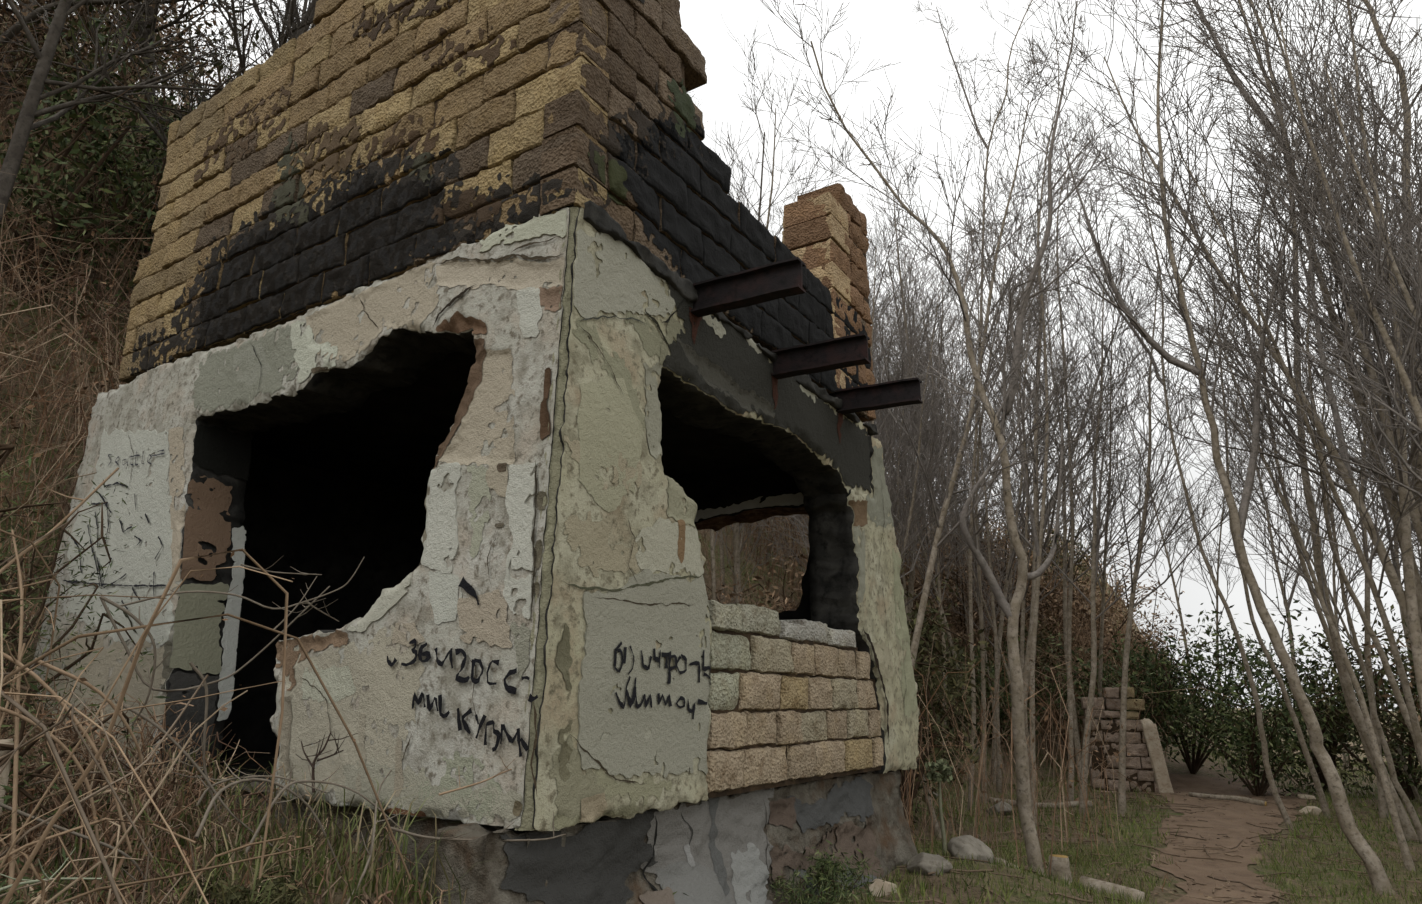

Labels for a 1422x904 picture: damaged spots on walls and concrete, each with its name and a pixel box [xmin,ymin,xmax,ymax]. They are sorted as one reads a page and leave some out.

spalling [352,0,519,76]
spalling [194,81,293,182]
water stain [288,117,372,180]
spalling [365,115,444,161]
water stain [431,187,502,227]
water stain [192,321,338,413]
peeling [67,427,246,721]